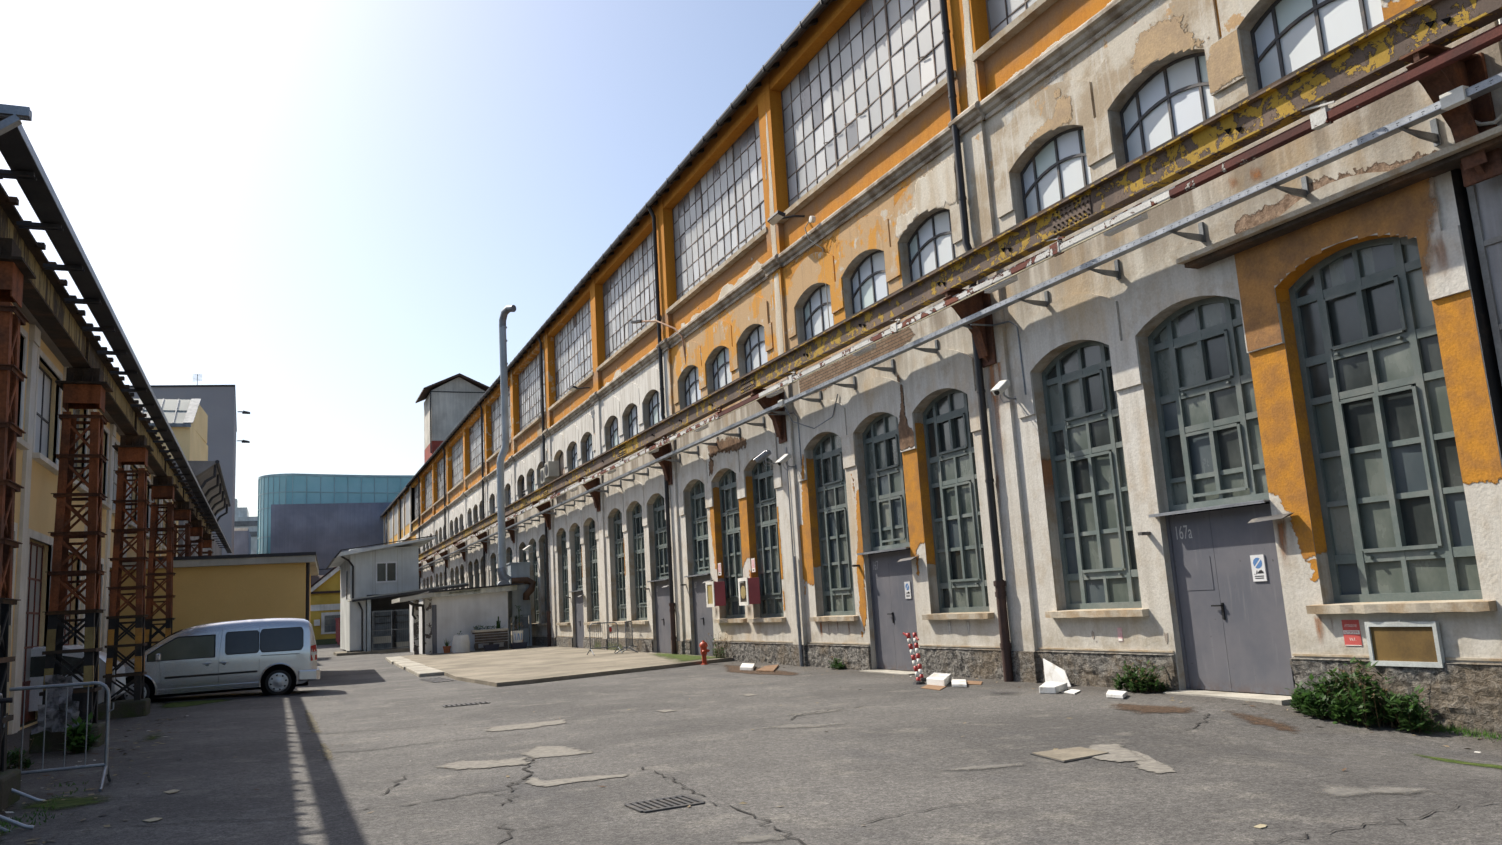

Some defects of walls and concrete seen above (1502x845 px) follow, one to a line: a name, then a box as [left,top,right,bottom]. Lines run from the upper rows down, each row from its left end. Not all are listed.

peeling [1382,0,1421,21]
peeling [1249,235,1414,582]
peeling [1432,290,1502,485]